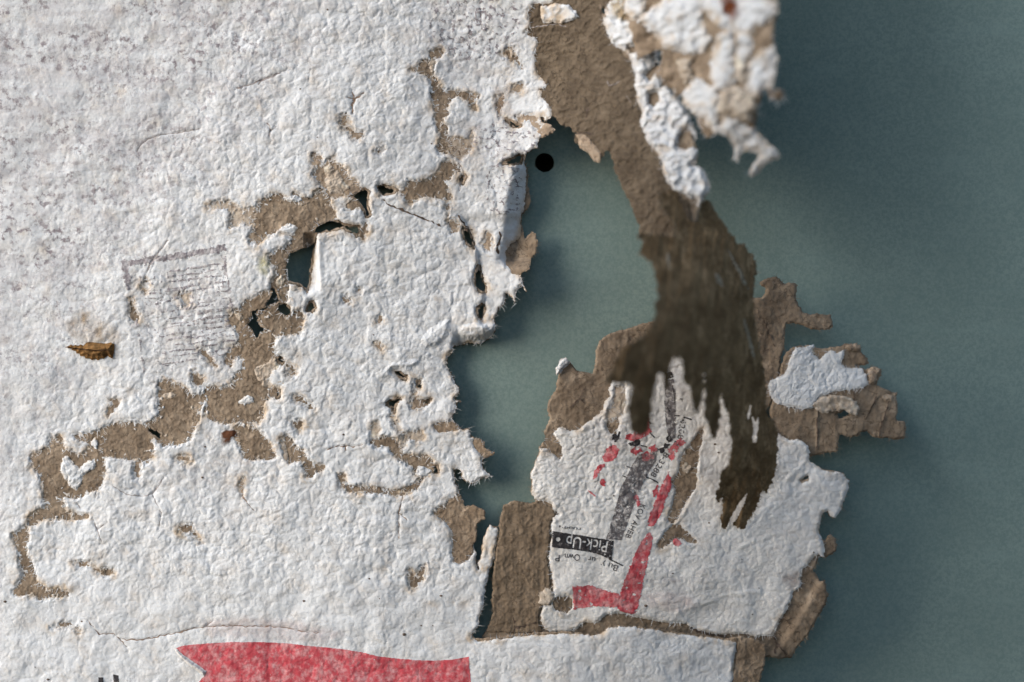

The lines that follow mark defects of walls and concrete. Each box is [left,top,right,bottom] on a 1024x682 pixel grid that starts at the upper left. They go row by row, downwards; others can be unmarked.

peeling [340,113,364,140]
peeling [395,50,479,234]
peeling [496,0,692,241]
peeling [506,231,538,275]
peeling [13,152,363,600]
peeling [606,385,626,434]
peeling [813,395,860,416]
peeling [543,433,563,459]
peeling [657,429,704,550]
peeling [434,490,485,564]
peeling [552,595,573,613]
peeling [472,625,767,682]